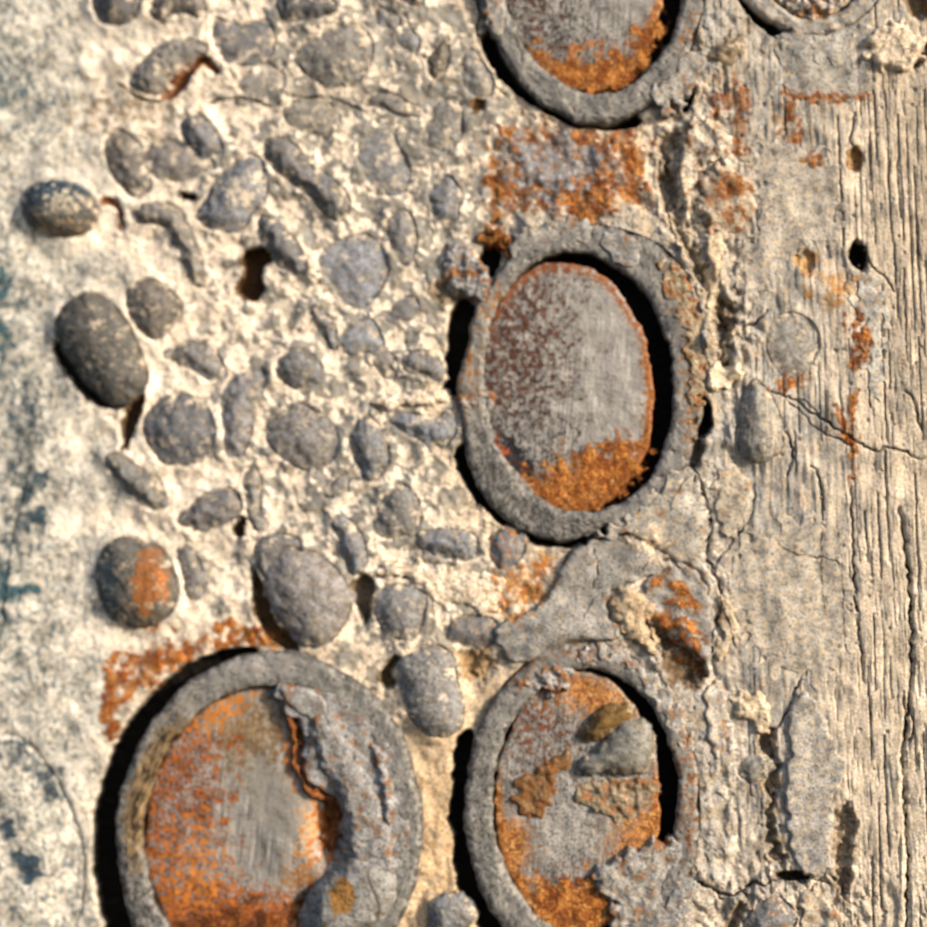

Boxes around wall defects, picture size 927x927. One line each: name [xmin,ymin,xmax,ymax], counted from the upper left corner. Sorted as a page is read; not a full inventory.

rust [529,15,665,95]
rust [476,114,659,260]
rust [801,252,873,371]
rust [518,428,657,511]
rust [833,391,861,482]
crack [772,27,927,927]
rust [646,566,709,678]
rust [99,617,289,742]
rust [283,705,343,852]
rust [509,748,572,820]
rust [516,861,617,927]
crack [697,880,779,900]